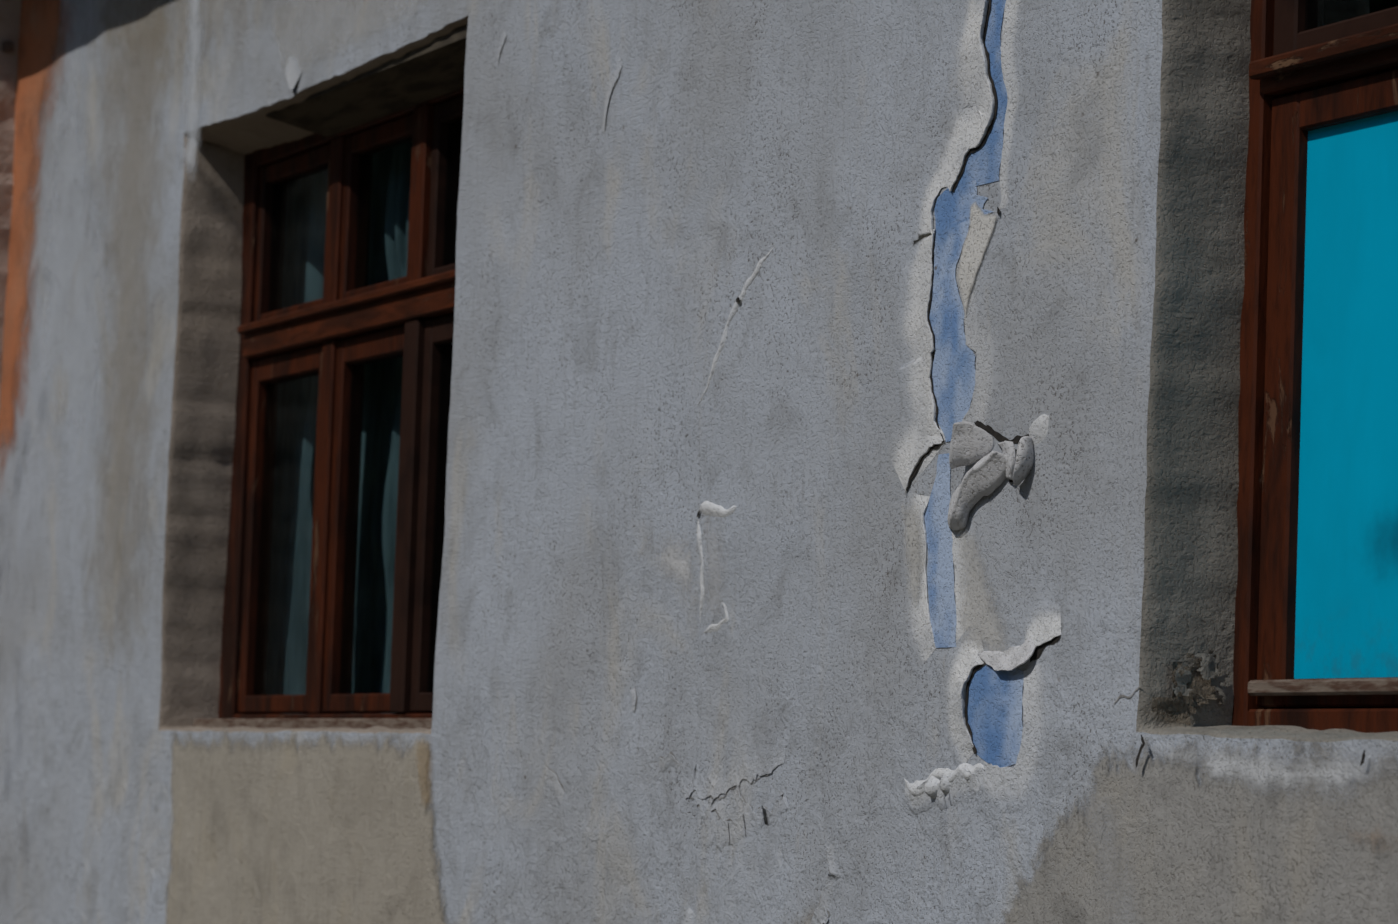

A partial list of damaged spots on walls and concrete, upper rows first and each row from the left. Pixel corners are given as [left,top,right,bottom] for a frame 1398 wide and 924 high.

crack [698,247,774,404]
peeling [940,601,1061,814]
crack [680,738,789,853]